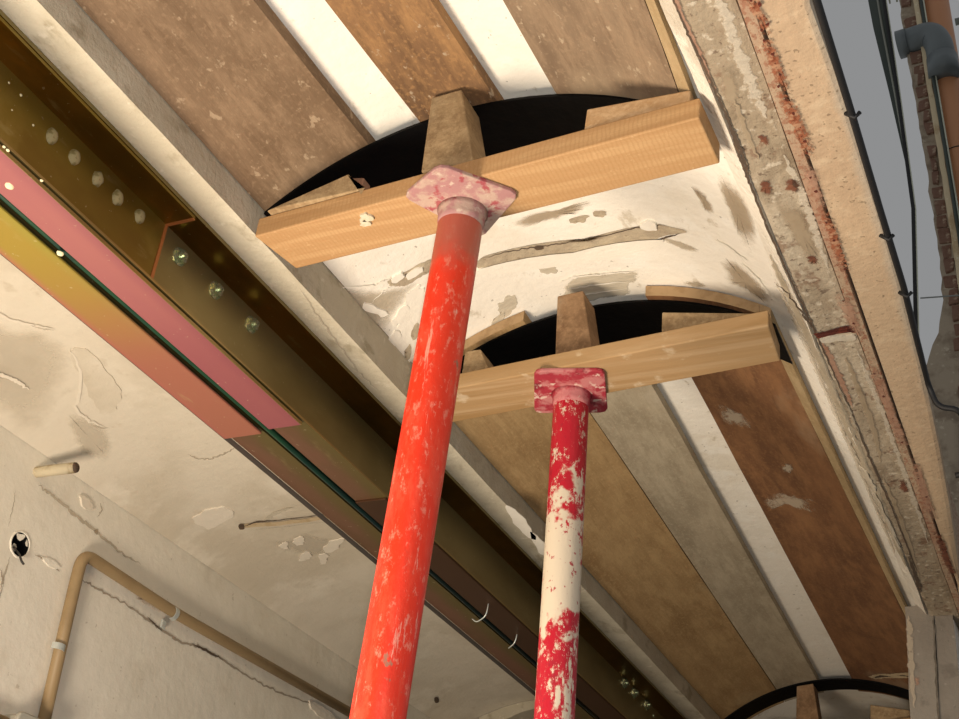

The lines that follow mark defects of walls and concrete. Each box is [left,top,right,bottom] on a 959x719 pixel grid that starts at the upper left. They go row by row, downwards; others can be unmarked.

crack [476,219,686,275]
peeling [540,267,638,301]
peeling [362,284,426,362]
peeling [492,295,517,325]
peeling [0,373,29,390]
crack [39,485,136,562]
peeling [278,536,344,564]
crack [0,558,10,594]
crack [84,582,337,719]